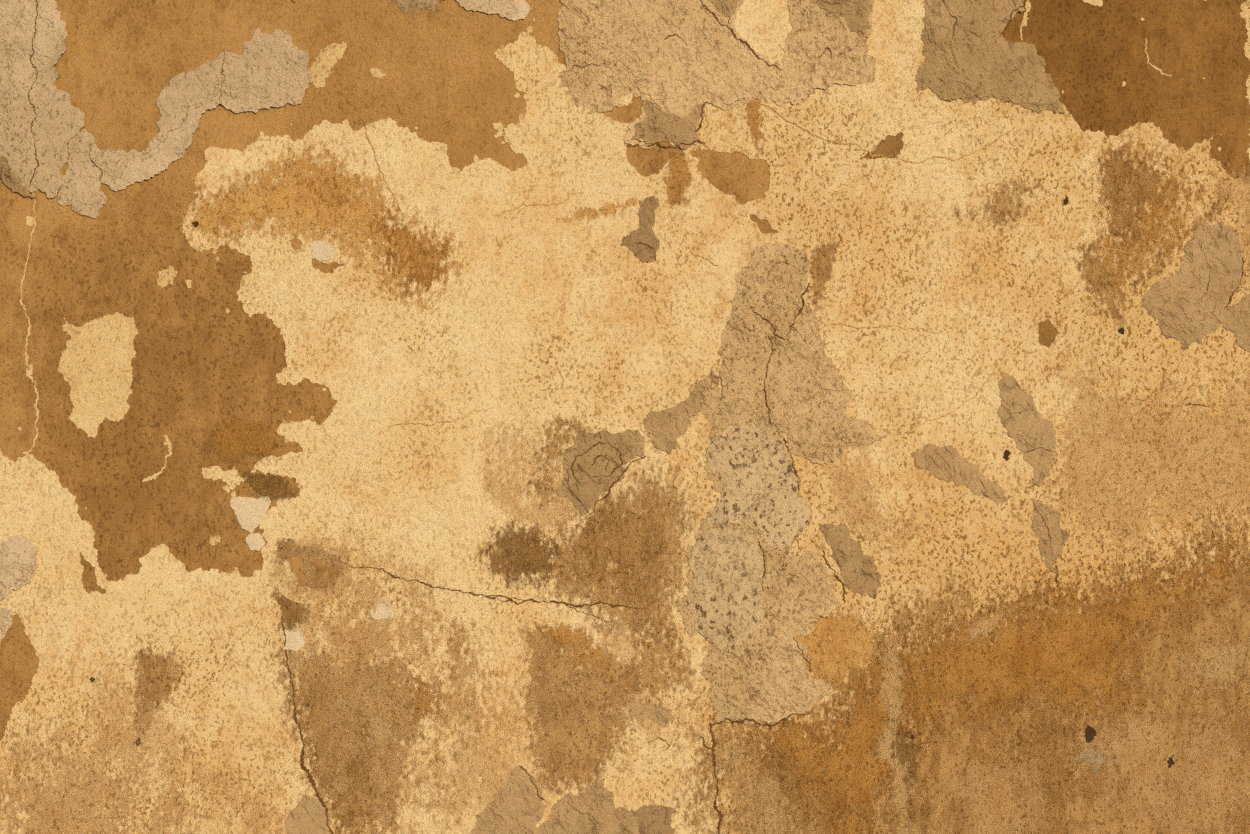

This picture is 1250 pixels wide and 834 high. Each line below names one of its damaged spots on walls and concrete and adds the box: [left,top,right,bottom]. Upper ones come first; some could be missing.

peeling [859,131,903,160]
peeling [915,0,1250,185]
peeling [1142,221,1250,351]
peeling [0,0,884,741]
peeling [911,444,1009,505]
peeling [997,371,1070,588]
crack [335,559,648,622]
crack [281,616,334,834]
water stain [685,504,1250,834]
peeling [285,792,332,834]
peeling [471,765,675,834]